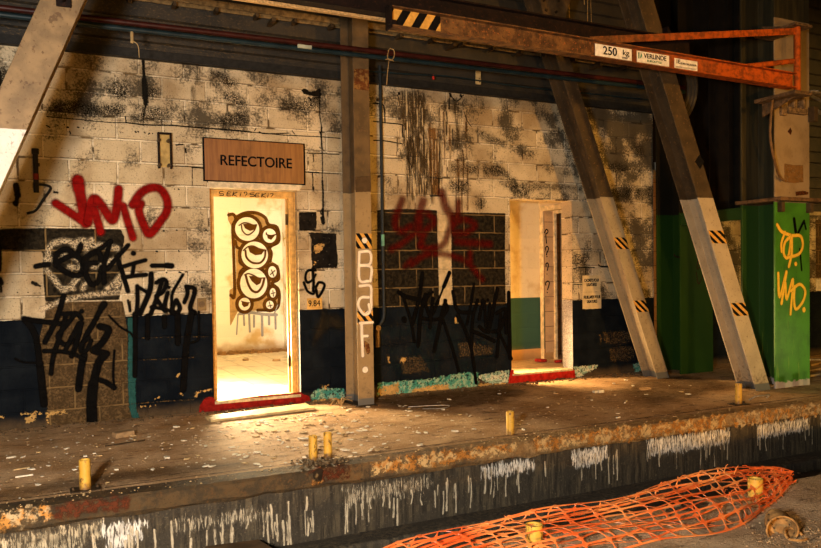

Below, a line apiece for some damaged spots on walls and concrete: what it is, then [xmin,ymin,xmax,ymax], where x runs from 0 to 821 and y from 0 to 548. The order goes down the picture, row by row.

leakage [312,96,325,225]
leakage [399,90,460,201]
rust [533,402,821,452]
leakage [481,458,546,498]
rust [0,495,130,530]
leakage [0,518,156,548]
leakage [170,501,292,548]
leakage [305,497,314,536]
leakage [342,474,457,534]